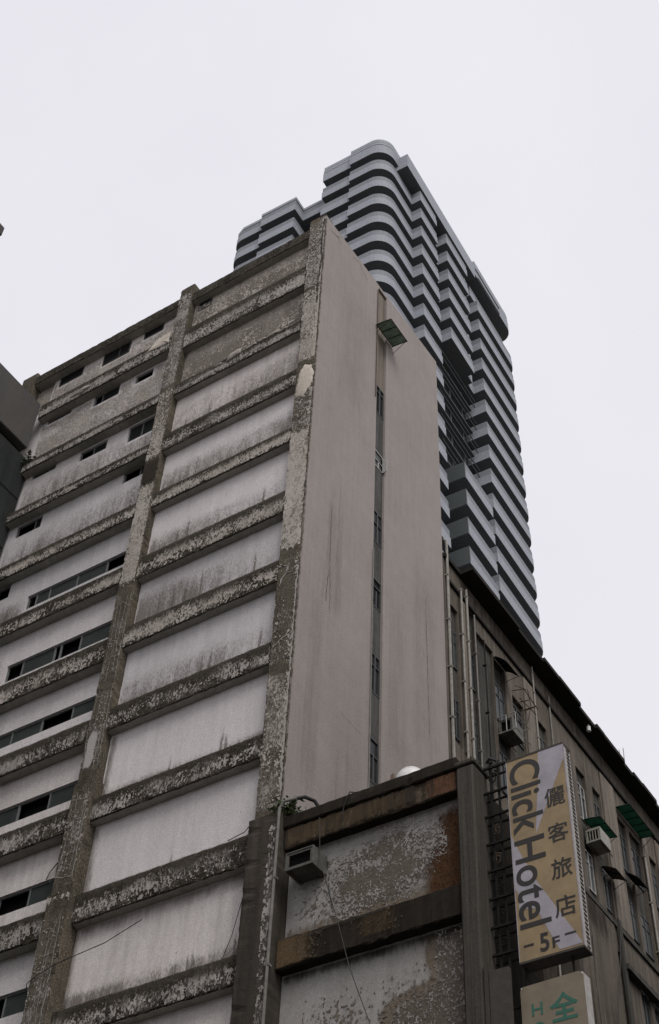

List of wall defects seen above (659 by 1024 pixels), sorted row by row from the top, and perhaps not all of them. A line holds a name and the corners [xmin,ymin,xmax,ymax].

peeling [0,216,327,877]
damp [109,636,270,716]
peeling [0,845,247,1024]
damp [284,785,415,845]
peeling [253,817,466,1024]
rust [422,806,460,893]